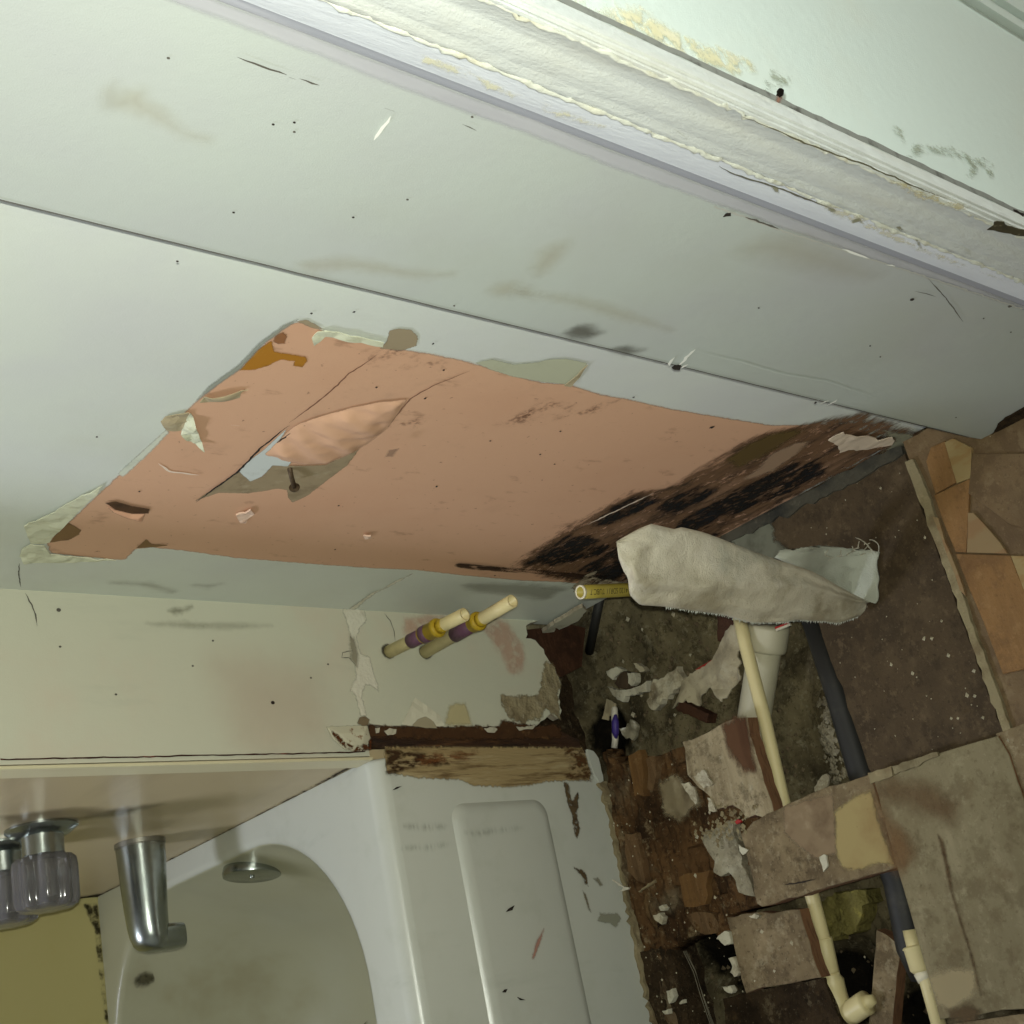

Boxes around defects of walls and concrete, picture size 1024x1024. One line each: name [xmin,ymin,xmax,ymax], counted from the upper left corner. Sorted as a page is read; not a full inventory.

peeling [612,9,751,72]
crack [721,167,863,224]
crack [0,199,967,437]
peeling [20,320,883,592]
water stain [456,413,921,584]
spalling [501,661,561,724]